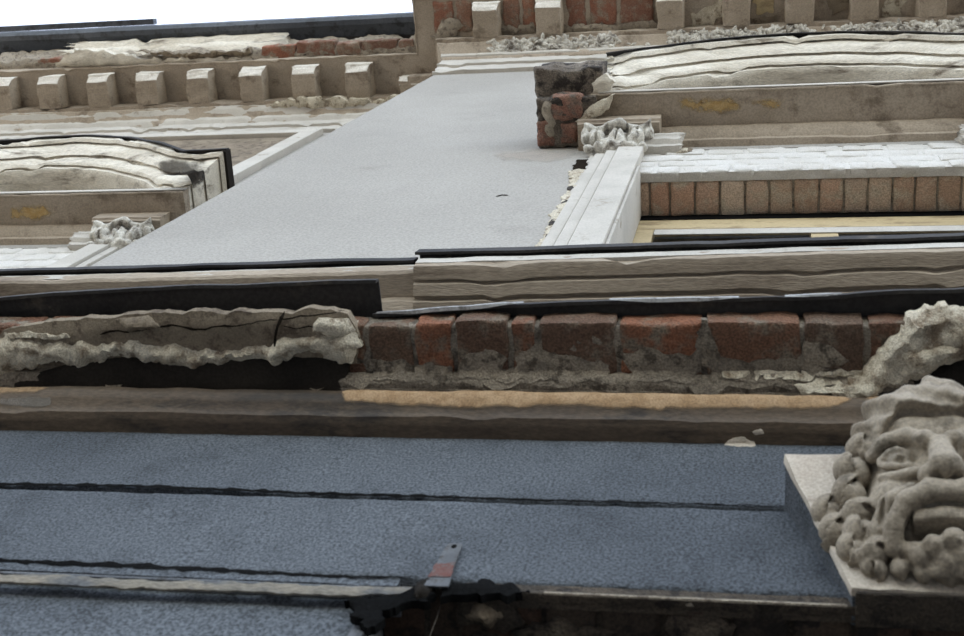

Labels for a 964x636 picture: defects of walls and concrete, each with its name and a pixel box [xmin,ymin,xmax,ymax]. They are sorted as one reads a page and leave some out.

flaking render [431,0,473,39]
flaking render [501,0,536,35]
flaking render [563,0,657,33]
flaking render [691,0,722,27]
flaking render [750,0,777,24]
flaking render [882,0,908,17]
flaking render [38,38,414,67]
peeling [575,73,616,123]
peeling [542,100,556,137]
crack [100,310,344,347]
flaking render [0,300,964,409]